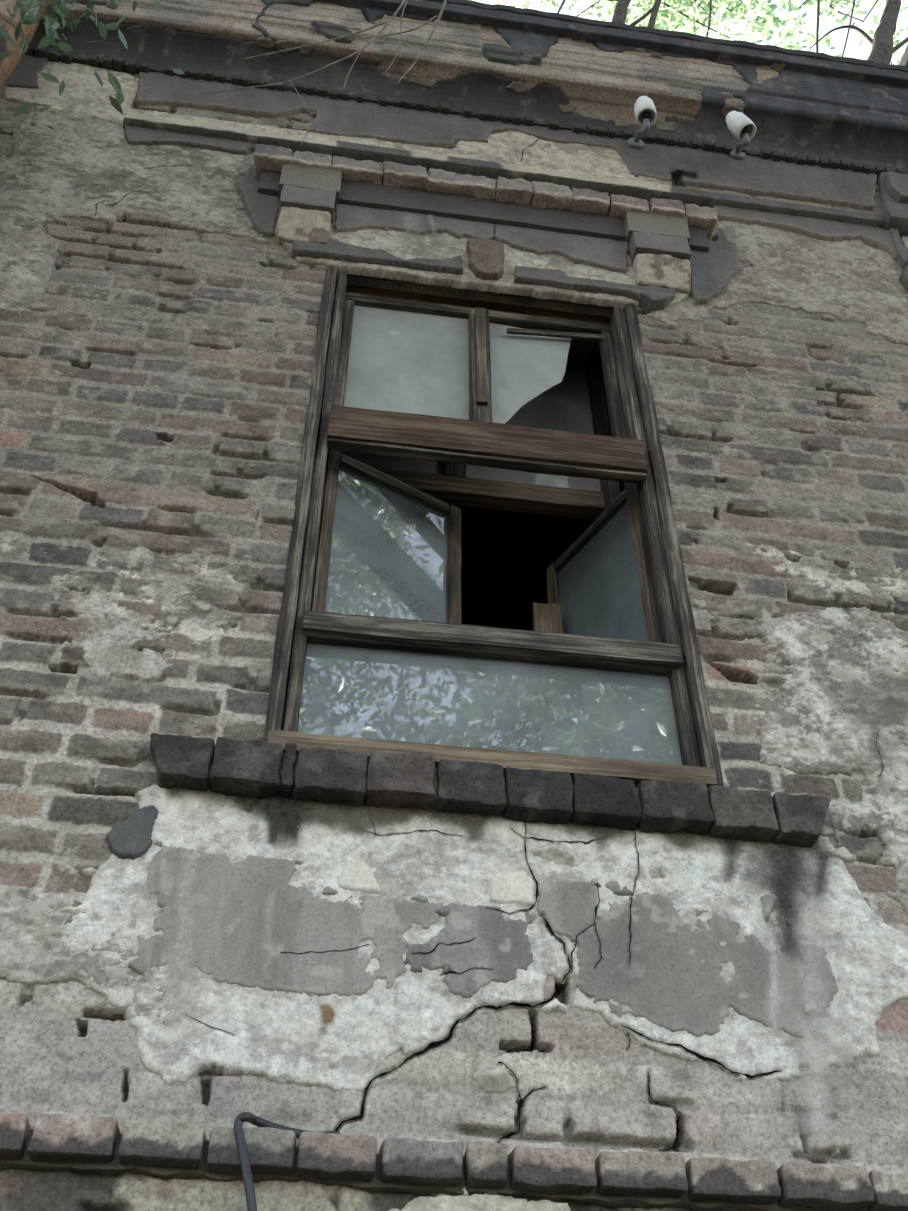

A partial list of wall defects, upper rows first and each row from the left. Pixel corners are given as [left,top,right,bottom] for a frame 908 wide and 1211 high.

peeling [0,0,908,346]
water stain [168,787,504,843]
spalling [0,606,908,1093]
water stain [534,820,638,843]
crack [280,944,370,954]
crack [335,822,639,1142]
water stain [663,832,828,1131]
crack [622,1025,782,1078]
crack [648,1073,681,1151]
spalling [389,1187,570,1211]